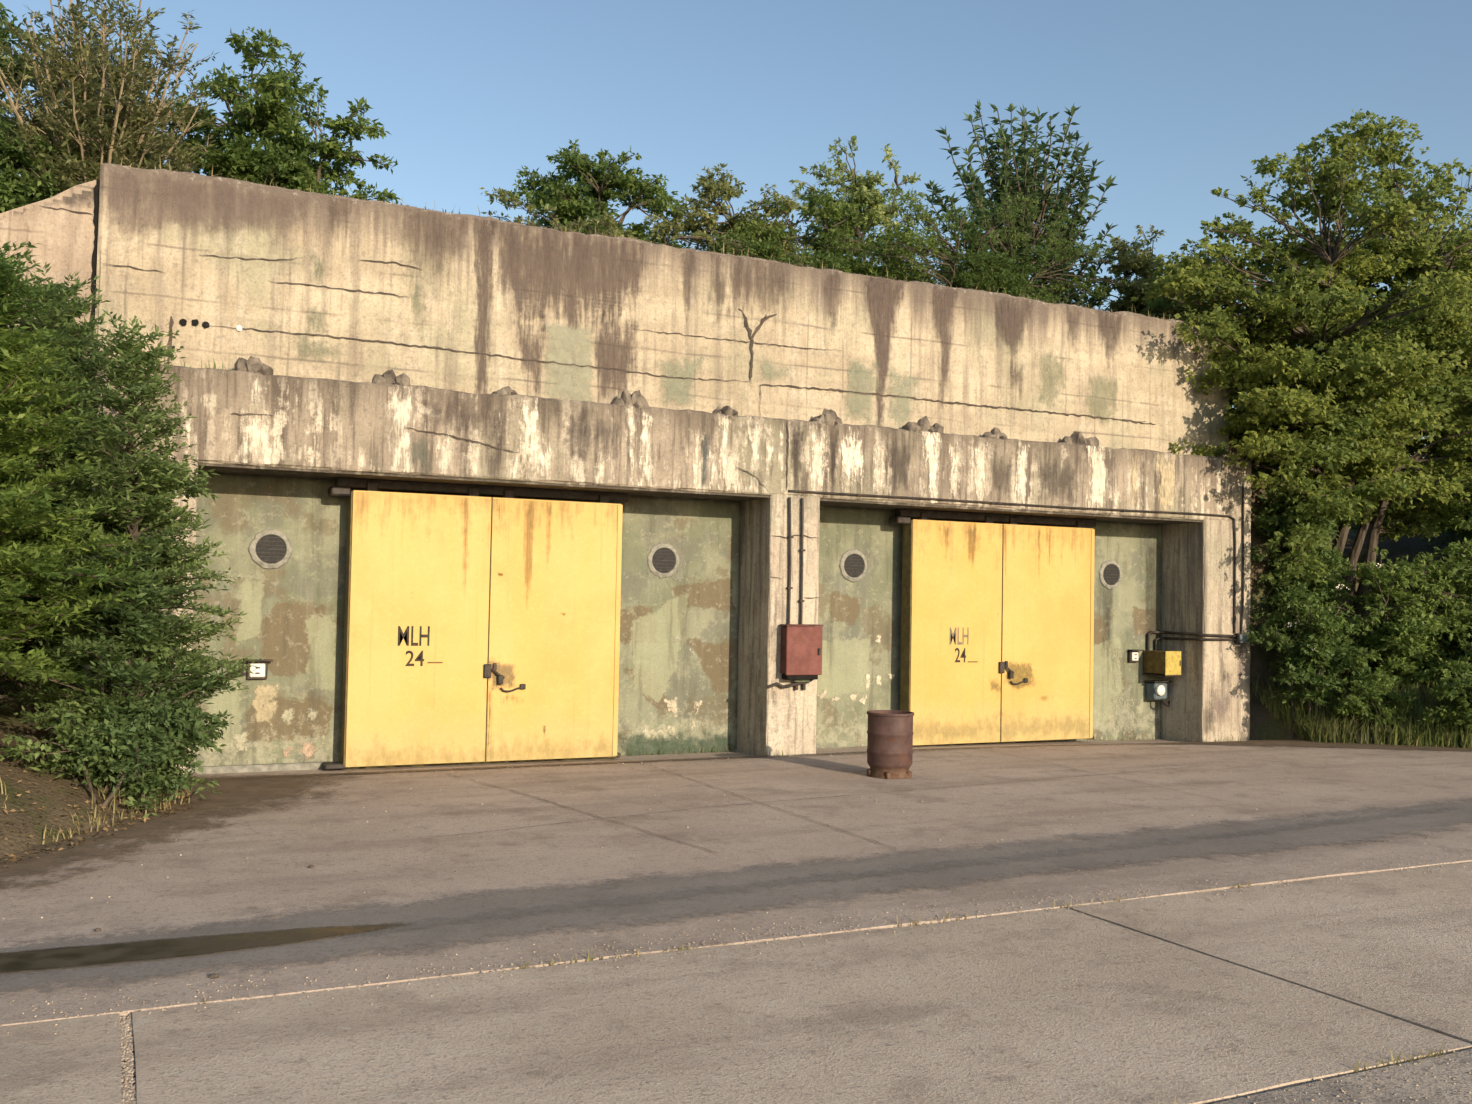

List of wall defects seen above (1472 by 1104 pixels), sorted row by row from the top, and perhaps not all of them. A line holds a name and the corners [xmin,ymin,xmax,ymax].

crack [166,316,174,365]
spalling [234,356,273,375]
water stain [235,381,272,464]
water stain [388,391,503,474]
water stain [470,220,652,486]
crack [209,308,1156,490]
water stain [866,275,904,426]
water stain [693,418,1106,508]
water stain [933,285,958,405]
water stain [996,299,1030,381]
peeling [233,684,318,752]
peeling [283,735,327,759]